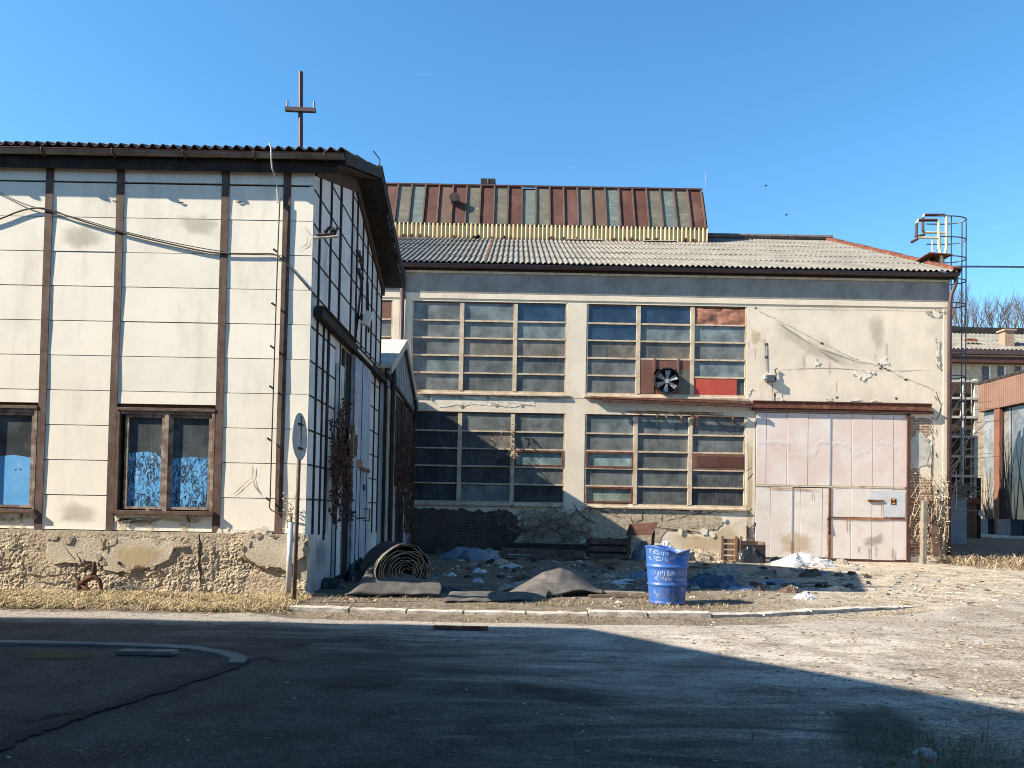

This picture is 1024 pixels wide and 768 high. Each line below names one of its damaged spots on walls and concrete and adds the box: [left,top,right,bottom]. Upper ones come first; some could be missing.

flaking render [413,504,727,554]
flaking render [910,416,944,560]